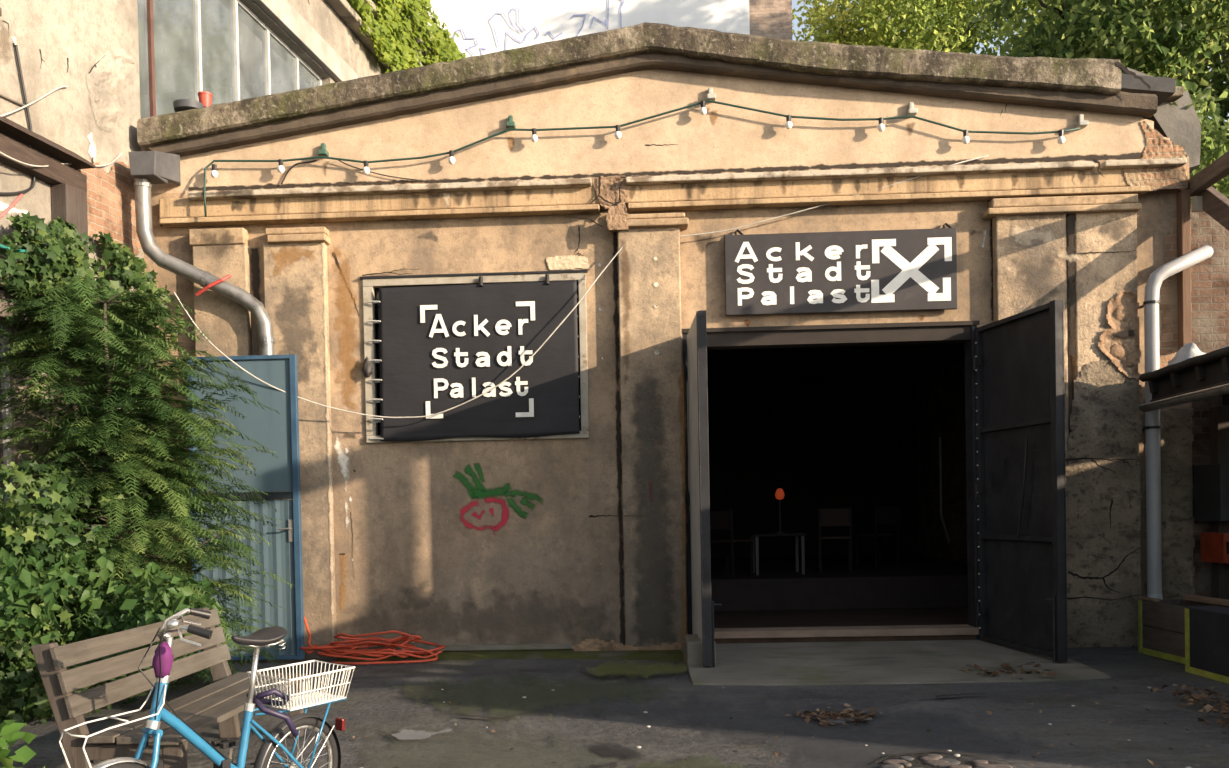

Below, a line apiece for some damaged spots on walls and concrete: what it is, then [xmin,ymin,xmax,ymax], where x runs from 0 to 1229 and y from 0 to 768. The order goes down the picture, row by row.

spalling [593,174,631,230]
flaking render [1121,121,1192,368]
spalling [1098,290,1141,379]
water stain [613,232,687,645]
crack [1065,457,1138,471]
crack [1067,549,1138,600]